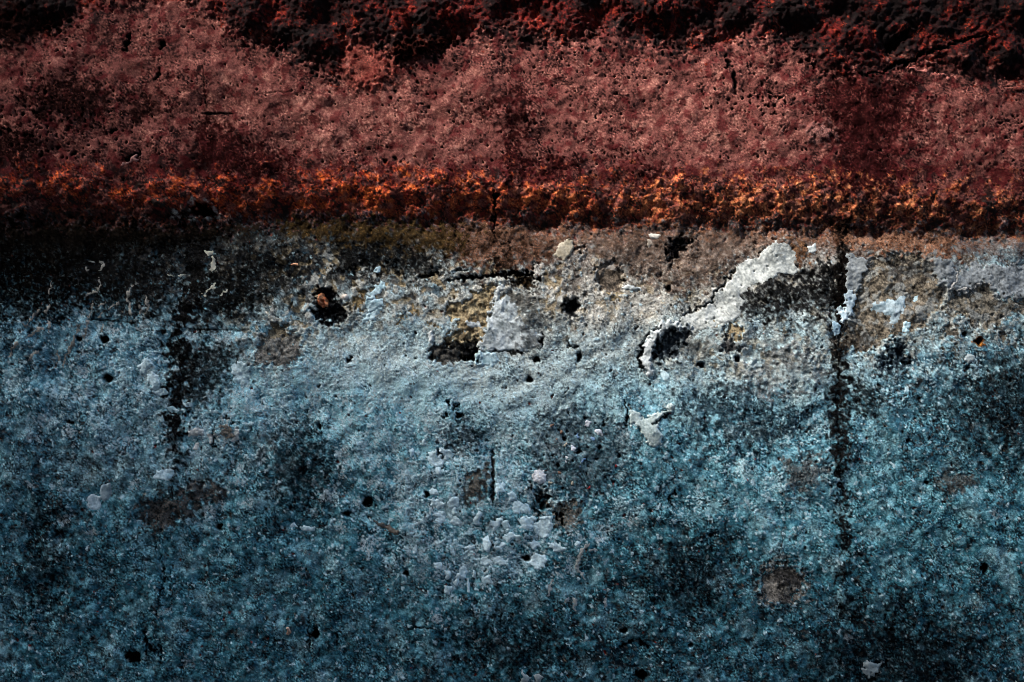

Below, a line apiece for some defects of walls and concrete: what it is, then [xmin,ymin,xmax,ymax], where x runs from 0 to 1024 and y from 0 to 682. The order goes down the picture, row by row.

water stain [330,238,454,286]
spalling [0,146,1024,386]
corrosion [584,220,766,303]
water stain [0,199,309,492]
water stain [244,396,367,522]
peeling [409,439,455,474]
peeling [428,401,675,595]